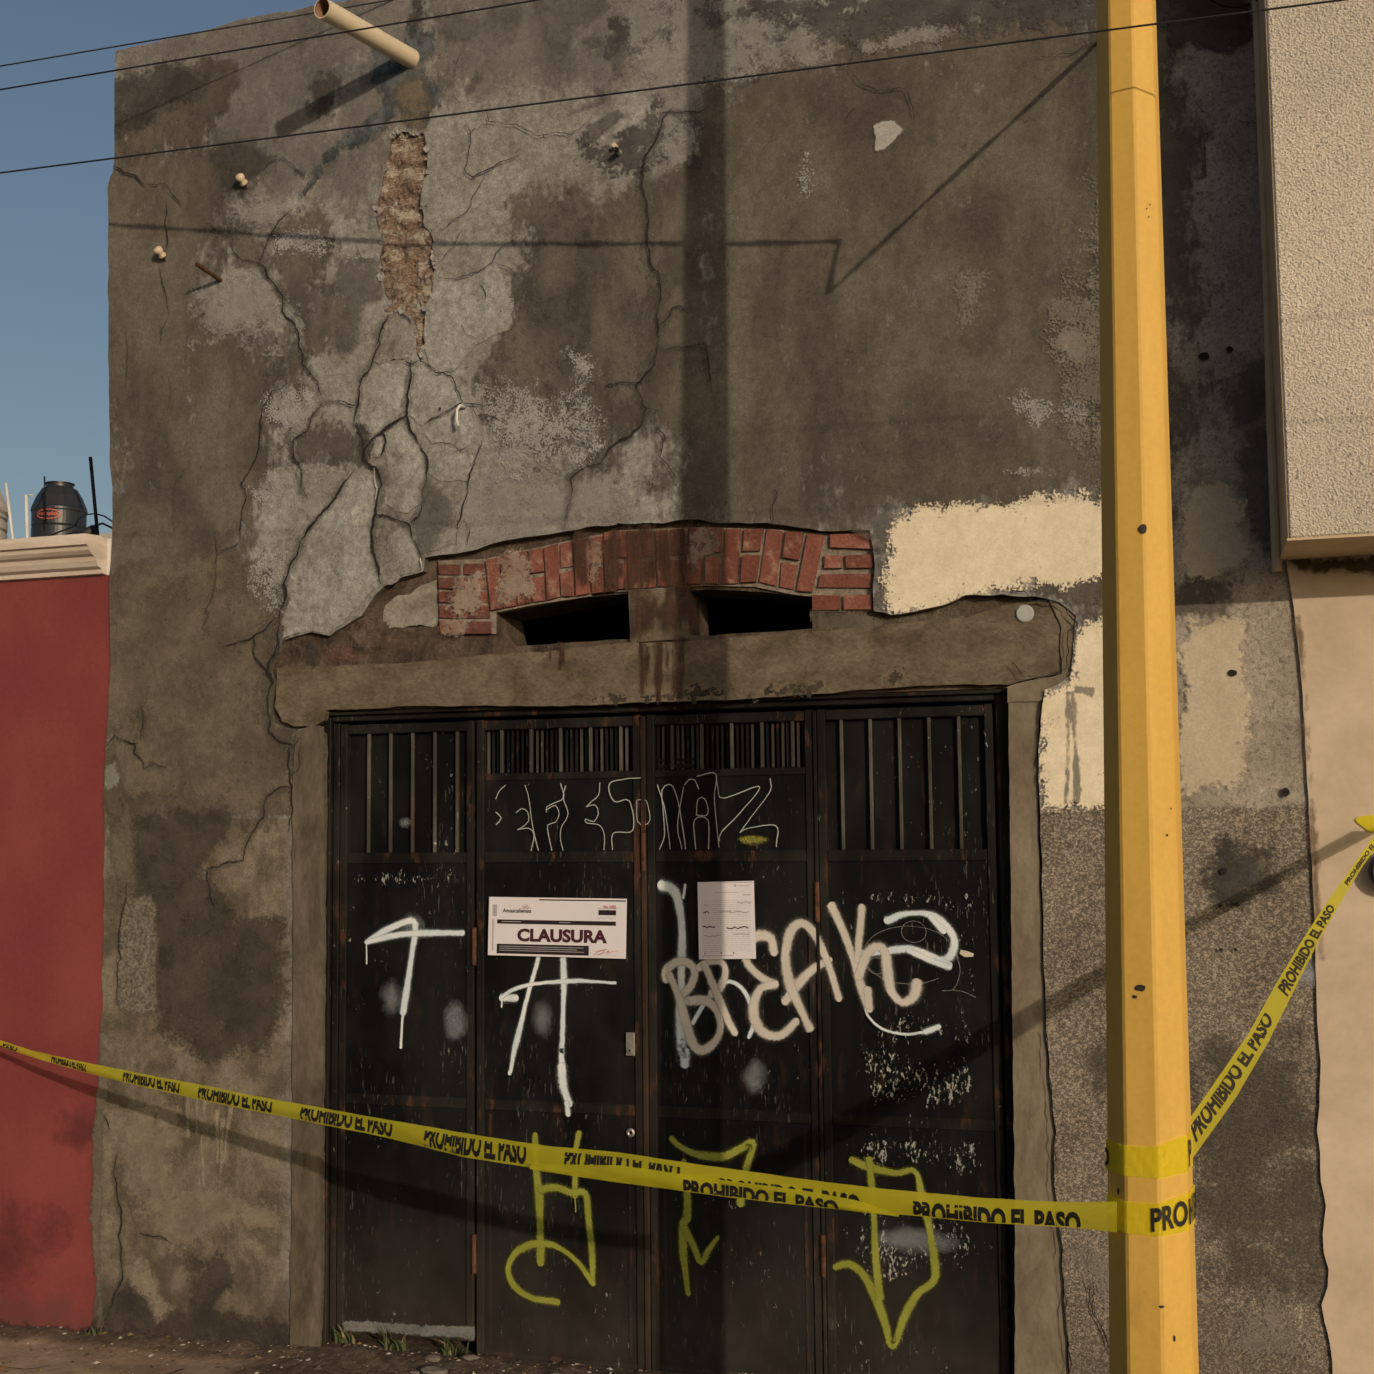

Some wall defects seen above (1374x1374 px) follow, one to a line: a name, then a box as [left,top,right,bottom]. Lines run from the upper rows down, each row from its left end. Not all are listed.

spalling [372,129,438,360]
crack [438,54,588,298]
crack [564,104,712,530]
damp [1156,0,1253,340]
crack [106,156,499,909]
peeling [585,539,603,584]
damp [103,0,1102,1065]
rust [573,520,697,703]
peeling [685,527,720,576]
peeling [878,487,1102,615]
peeling [1038,616,1104,813]
damp [1174,573,1245,619]